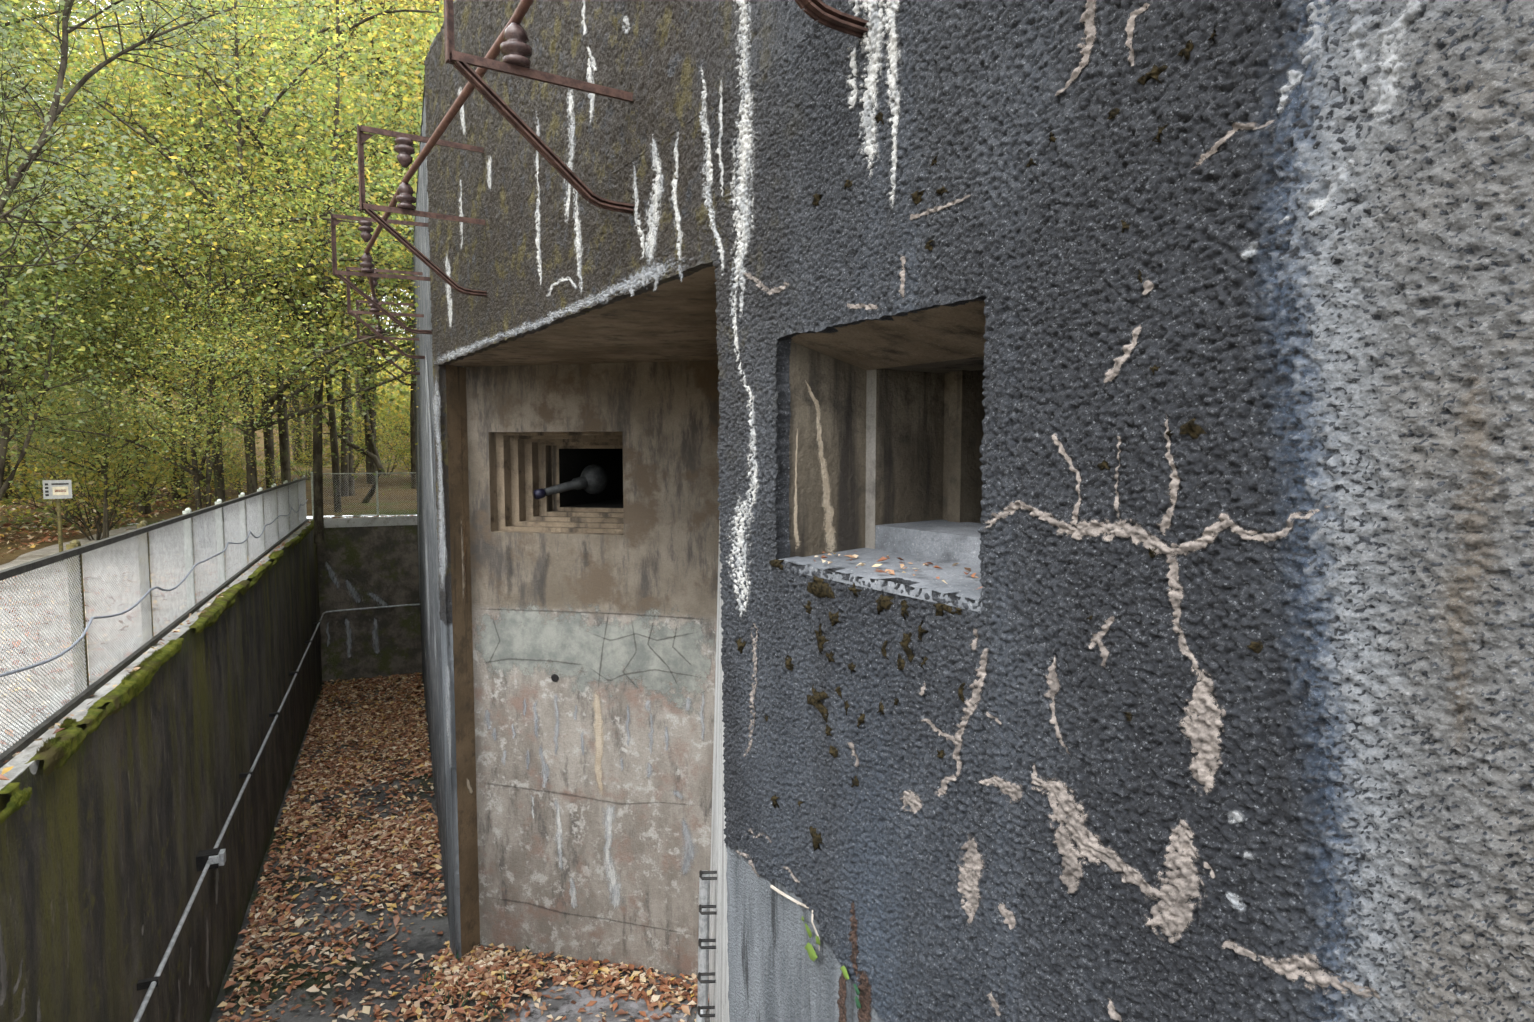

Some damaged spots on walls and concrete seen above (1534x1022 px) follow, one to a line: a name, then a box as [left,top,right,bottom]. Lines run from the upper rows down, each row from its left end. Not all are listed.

efflorescence [845,0,901,208]
efflorescence [414,0,683,664]
efflorescence [699,0,758,617]
crack [984,414,1330,796]
leakage [178,868,219,1022]
rust [837,901,872,1022]